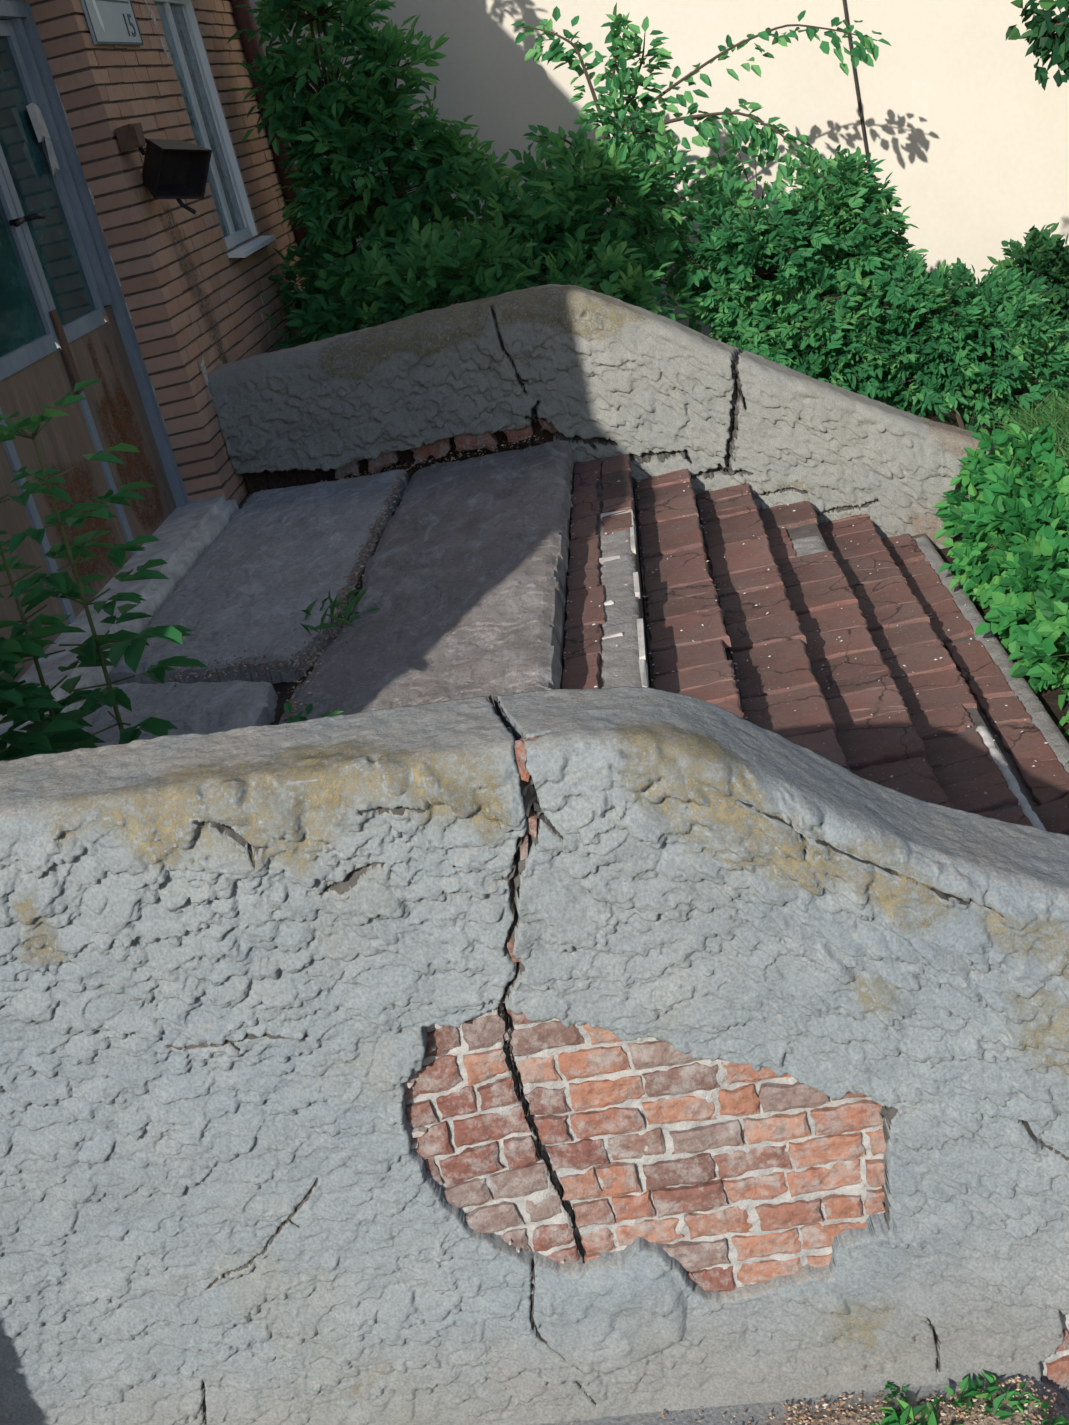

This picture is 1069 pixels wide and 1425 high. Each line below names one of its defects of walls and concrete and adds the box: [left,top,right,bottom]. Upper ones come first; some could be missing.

crack [491,307,878,513]
crack [488,695,563,1003]
crack [207,1178,318,1289]
crack [529,1258,596,1405]
spalling [404,993,886,1292]
spalling [1039,1310,1069,1386]